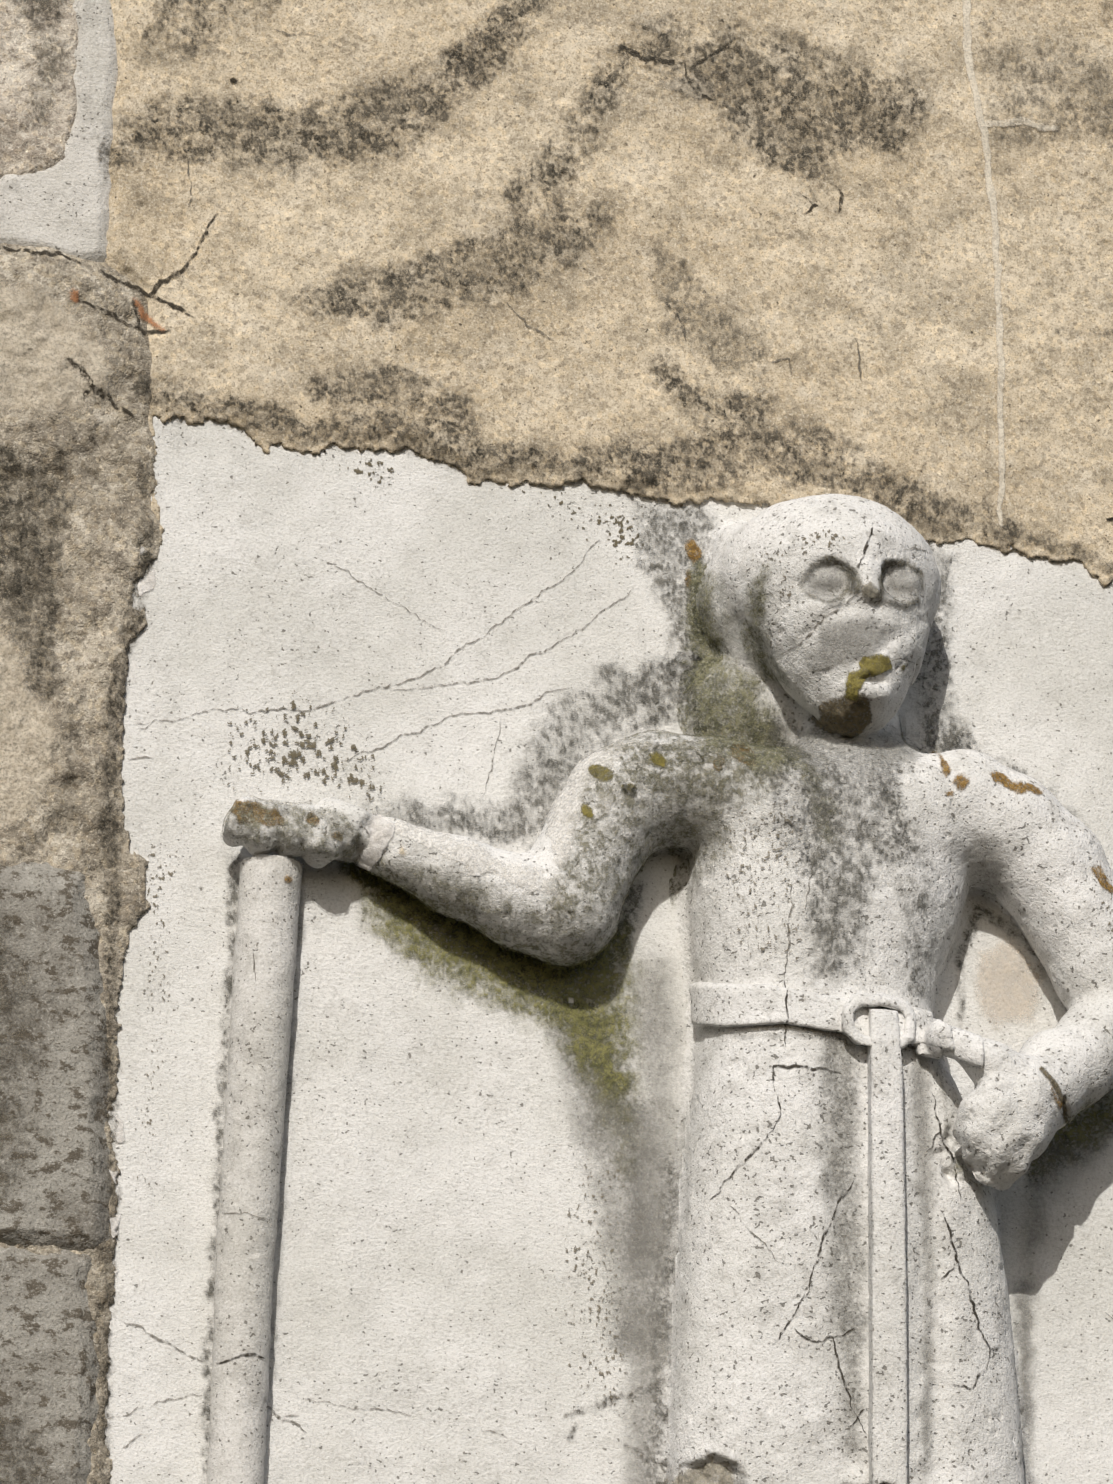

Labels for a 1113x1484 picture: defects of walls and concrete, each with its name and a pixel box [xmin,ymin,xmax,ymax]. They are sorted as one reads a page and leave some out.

crack [129,541,631,784]
leakage [745,714,833,840]
leakage [909,730,970,753]
leakage [607,884,642,959]
crack [711,804,842,1259]
crack [779,1181,869,1433]
crack [927,1094,997,1390]
spalling [665,1461,734,1484]